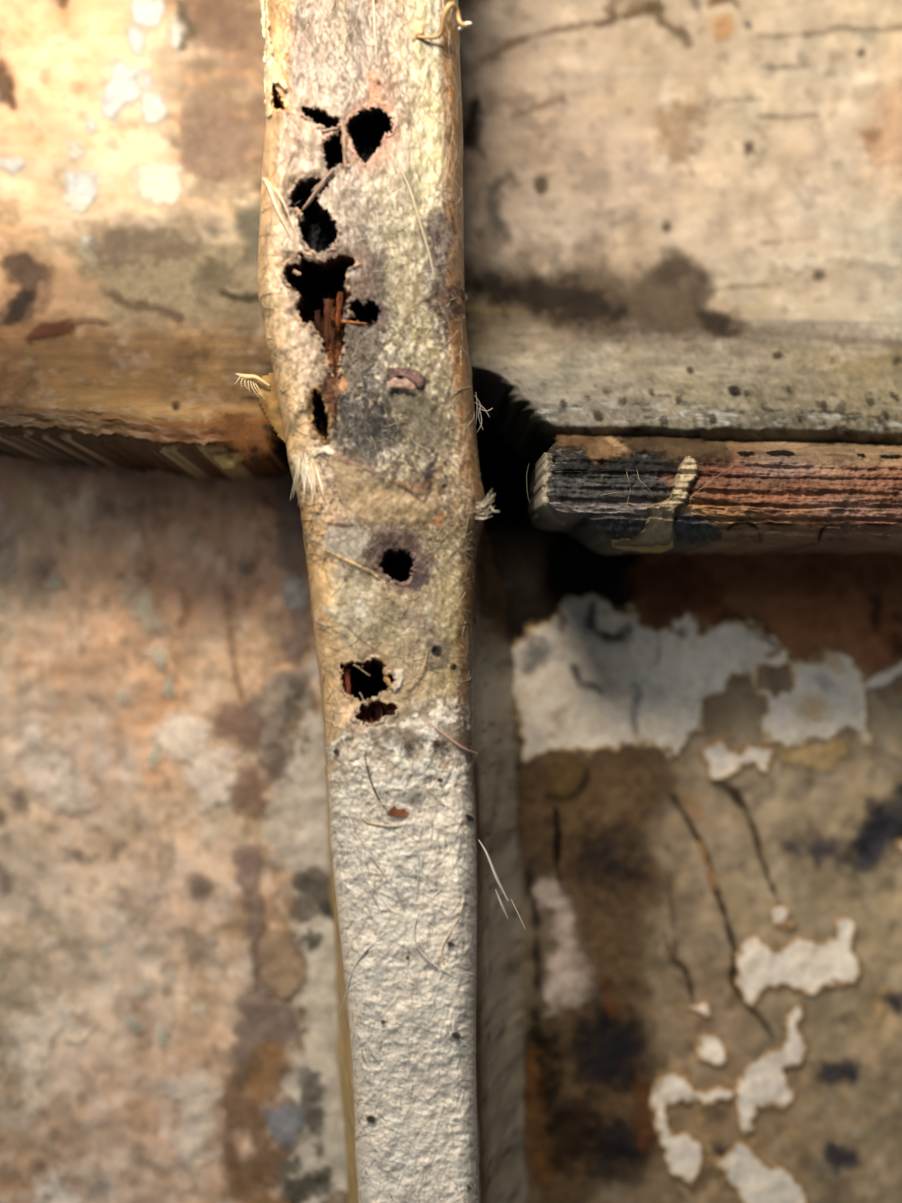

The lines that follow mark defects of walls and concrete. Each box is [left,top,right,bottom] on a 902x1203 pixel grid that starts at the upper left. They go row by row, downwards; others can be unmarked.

crack [489,23,585,56]
leakage [421,211,778,335]
peeling [512,593,902,781]
peeling [531,877,597,1017]
leakage [515,745,673,1203]
crack [666,791,773,1036]
crack [719,782,780,906]
peeling [649,905,861,1203]